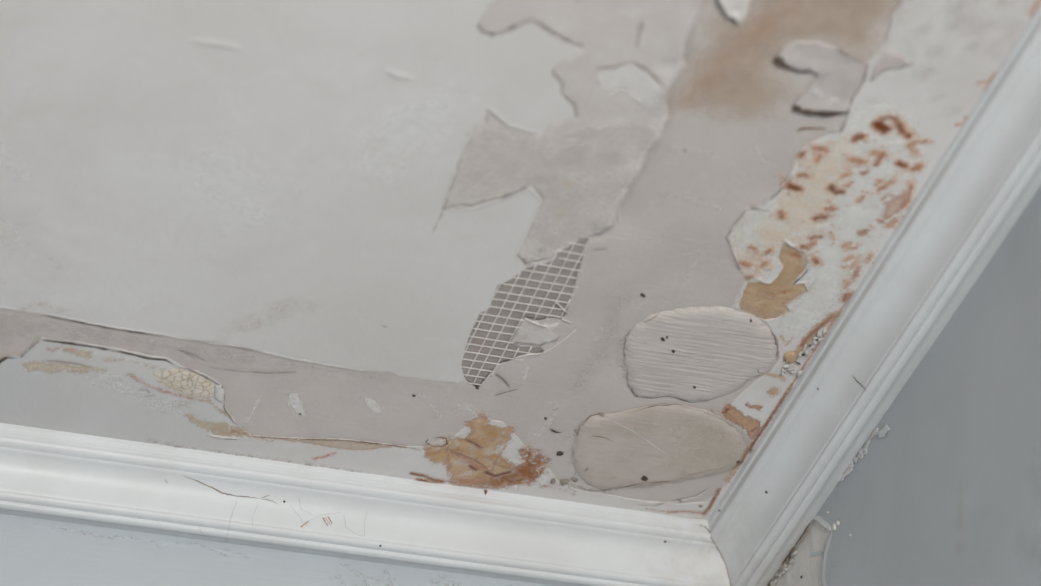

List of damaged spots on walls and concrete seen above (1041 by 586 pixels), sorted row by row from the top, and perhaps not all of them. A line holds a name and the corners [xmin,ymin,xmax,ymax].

peeling [0,0,914,504]
flaking render [767,516,840,586]